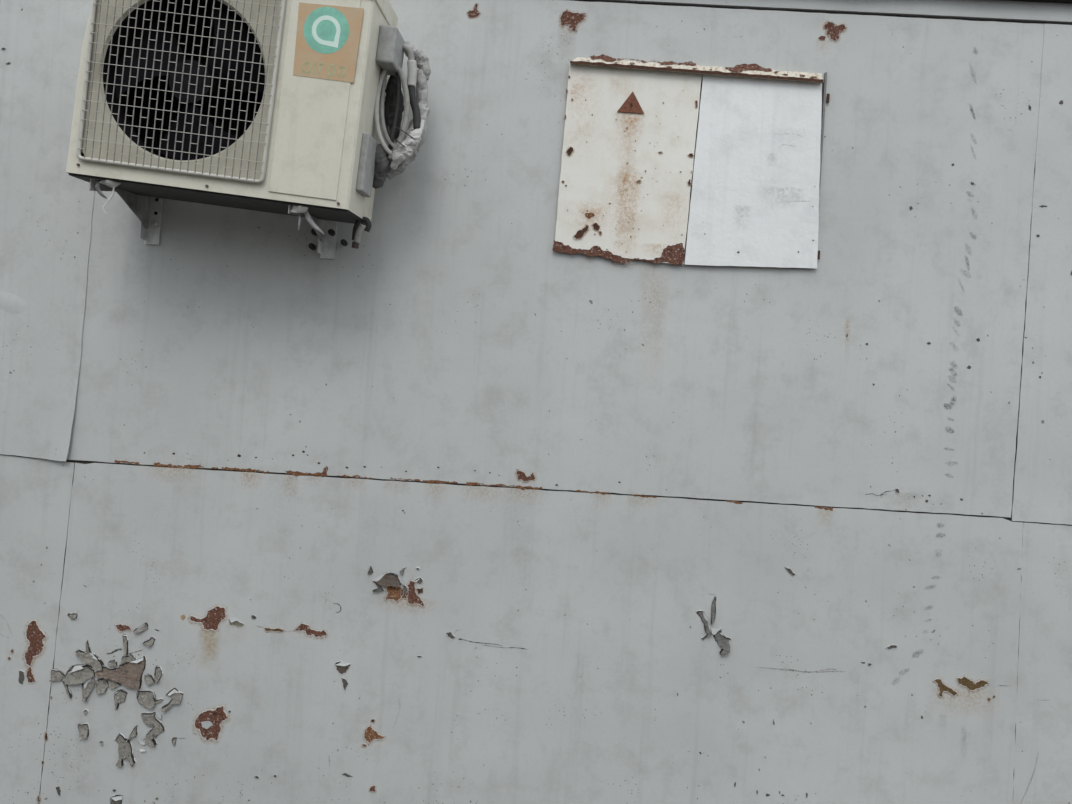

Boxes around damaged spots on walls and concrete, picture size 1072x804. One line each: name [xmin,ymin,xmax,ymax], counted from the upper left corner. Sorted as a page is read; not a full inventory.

rust [559,10,586,32]
rust [819,21,847,42]
rust [154,453,269,474]
rust [286,451,371,479]
rust [381,467,542,490]
peeling [367,566,425,607]
rust [181,605,227,631]
peeling [696,596,731,655]
rust [8,620,47,685]
peeling [49,622,185,767]
rust [934,676,1002,701]
rust [194,705,232,742]